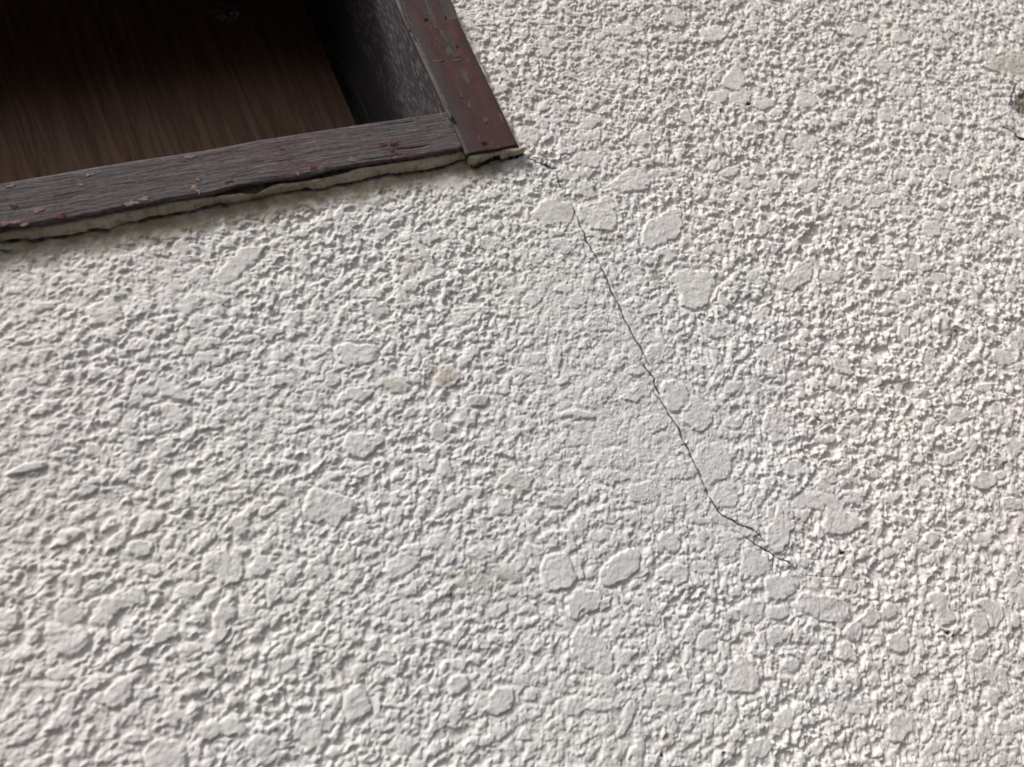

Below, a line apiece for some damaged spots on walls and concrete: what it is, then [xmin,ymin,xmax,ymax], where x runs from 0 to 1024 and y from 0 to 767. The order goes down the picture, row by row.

crack [279,153,857,580]